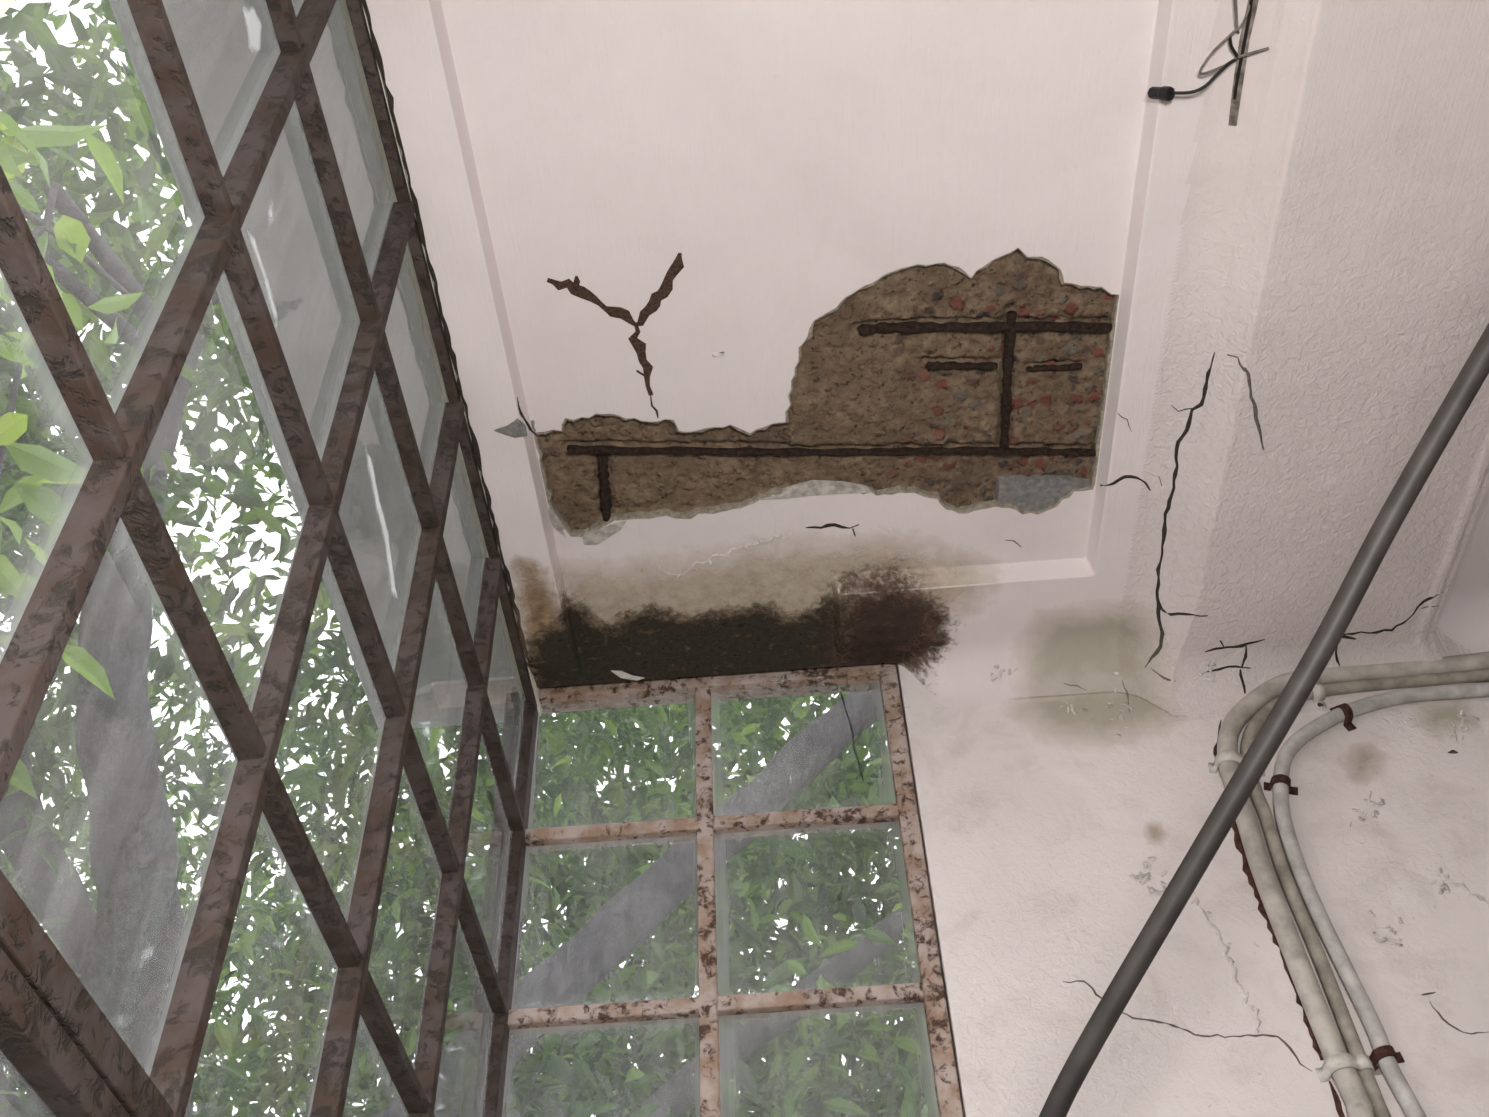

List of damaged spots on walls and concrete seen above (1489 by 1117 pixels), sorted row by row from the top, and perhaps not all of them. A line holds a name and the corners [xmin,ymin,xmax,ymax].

crack [547,253,684,418]
spalling [494,248,1119,545]
crack [1100,352,1265,713]
leakage [522,551,963,688]
crack [1335,592,1443,666]
crack [1213,720,1221,757]
crack [1063,822,1345,1117]